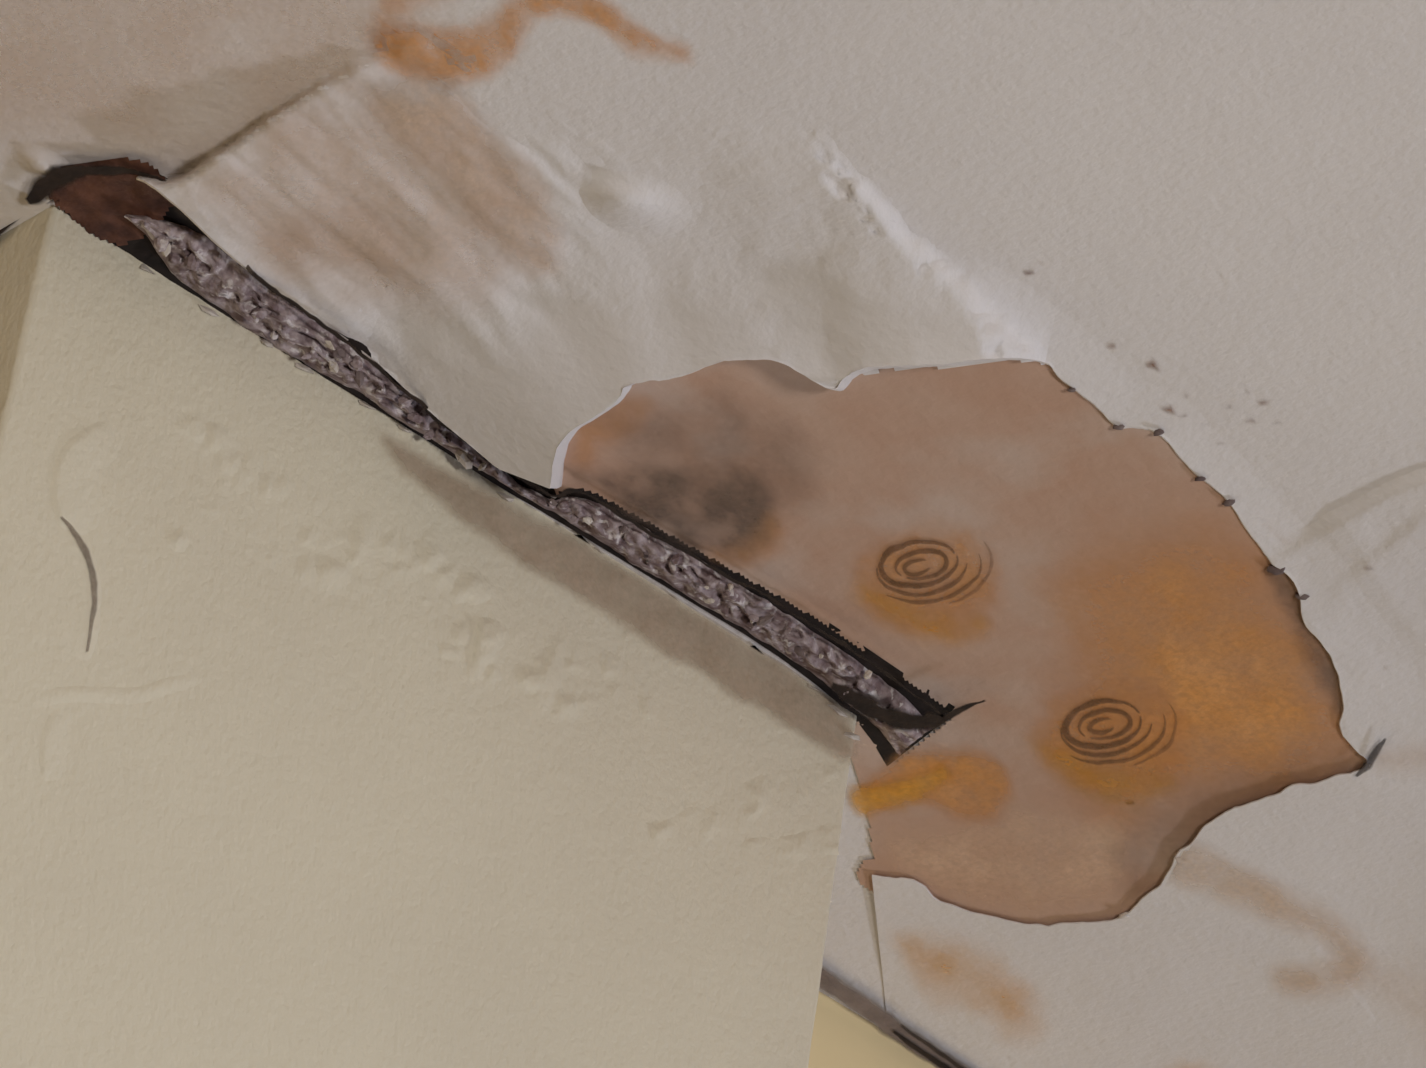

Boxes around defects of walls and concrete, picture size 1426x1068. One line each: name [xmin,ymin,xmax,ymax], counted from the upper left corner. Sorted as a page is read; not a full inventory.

crack [0,157,985,766]
damp [703,484,766,547]
peeling [348,219,1426,1068]
rust [1095,554,1323,771]
rust [852,756,1007,814]